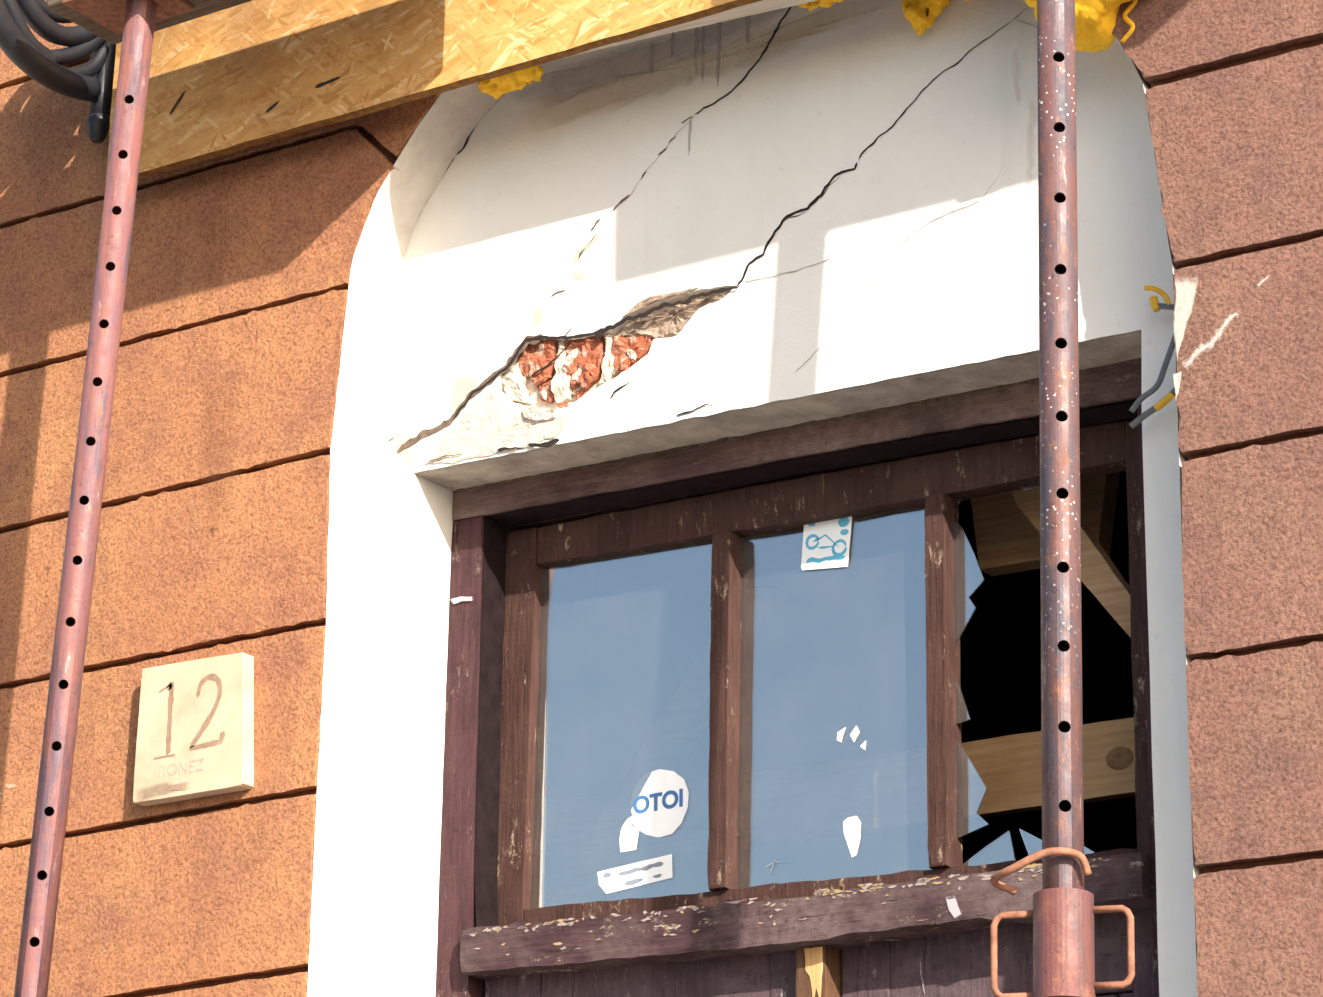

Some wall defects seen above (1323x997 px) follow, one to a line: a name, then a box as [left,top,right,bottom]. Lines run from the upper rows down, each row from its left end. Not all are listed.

crack [418,94,505,217]
crack [533,6,792,336]
crack [737,7,1037,285]
crack [497,438,560,452]
flaking render [387,285,740,466]
crack [676,404,716,416]